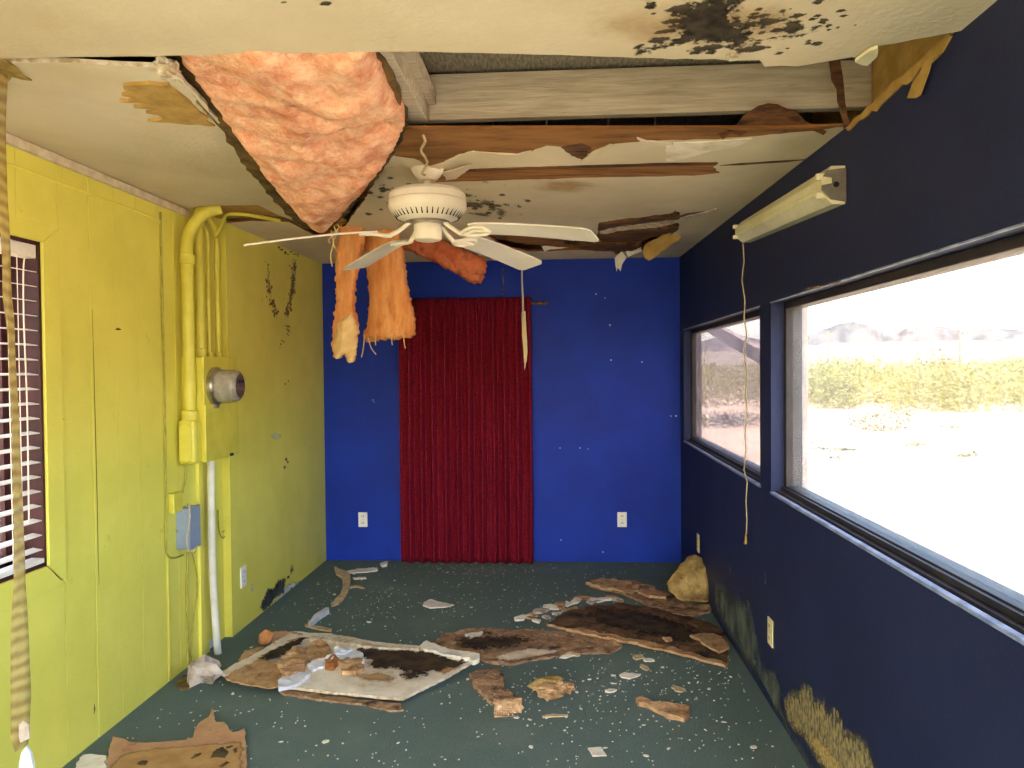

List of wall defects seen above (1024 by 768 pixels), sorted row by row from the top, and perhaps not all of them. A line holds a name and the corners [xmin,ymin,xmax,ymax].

leakage [633,0,856,55]
peeling [394,33,952,183]
leakage [715,585,874,768]